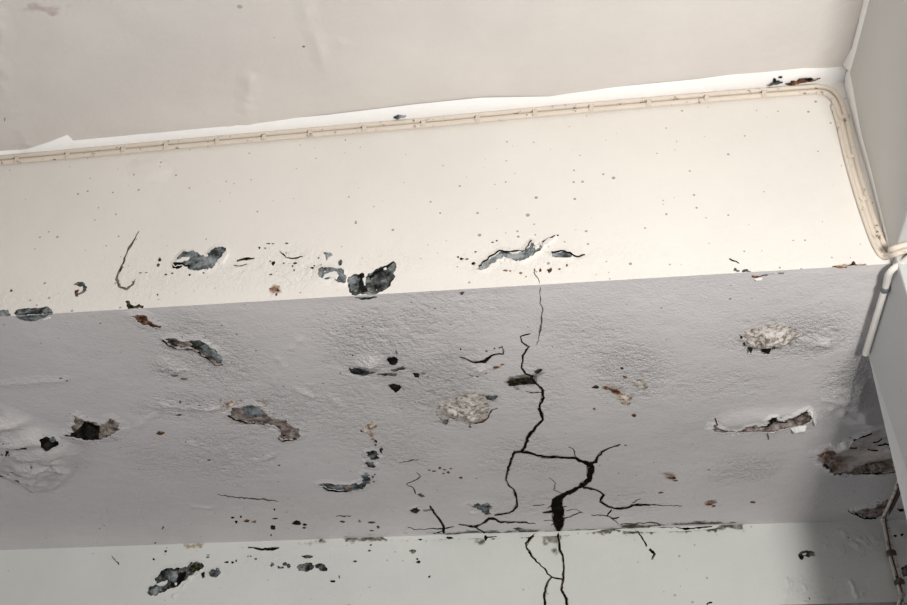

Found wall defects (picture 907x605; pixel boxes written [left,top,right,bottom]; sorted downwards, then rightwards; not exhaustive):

crack [115,231,139,290]
peeling [157,244,231,276]
peeling [311,252,397,300]
peeling [457,235,585,274]
peeling [0,306,53,321]
peeling [123,300,233,368]
peeling [49,411,132,446]
peeling [219,399,309,444]
crack [406,272,680,605]
peeling [705,402,822,440]
peeling [805,425,896,478]
peeling [144,556,237,599]